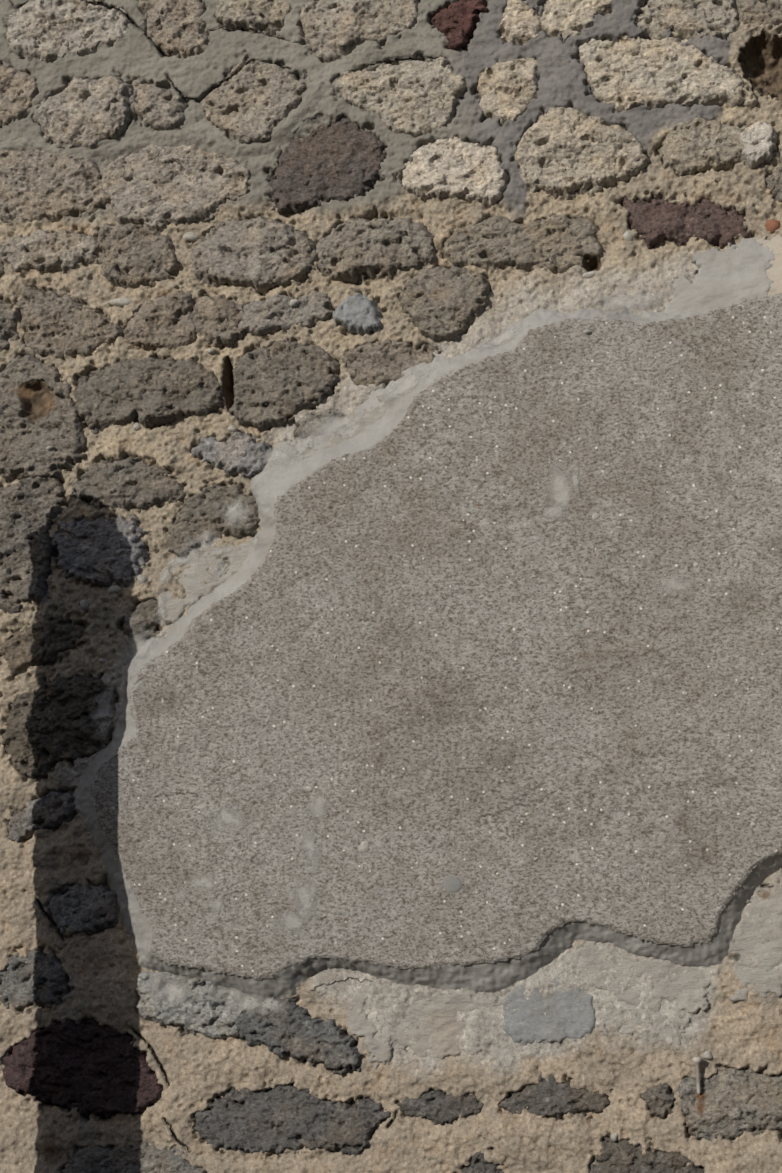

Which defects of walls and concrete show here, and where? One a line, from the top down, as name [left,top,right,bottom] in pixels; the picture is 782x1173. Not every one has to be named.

crack [81,0,300,103]
hole [739,32,782,101]
peeling [309,968,507,1068]
peeling [575,941,713,1047]